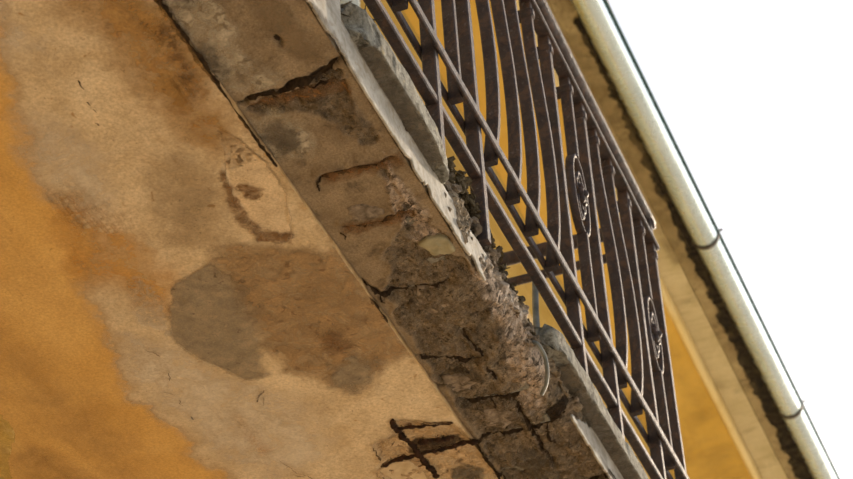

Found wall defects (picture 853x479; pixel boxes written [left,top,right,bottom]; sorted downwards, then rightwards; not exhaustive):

leakage [166,0,250,89]
crack [154,0,337,167]
peeling [0,0,606,479]
crack [316,157,388,192]
leakage [169,245,407,392]
crack [420,326,578,479]
crack [590,469,616,479]